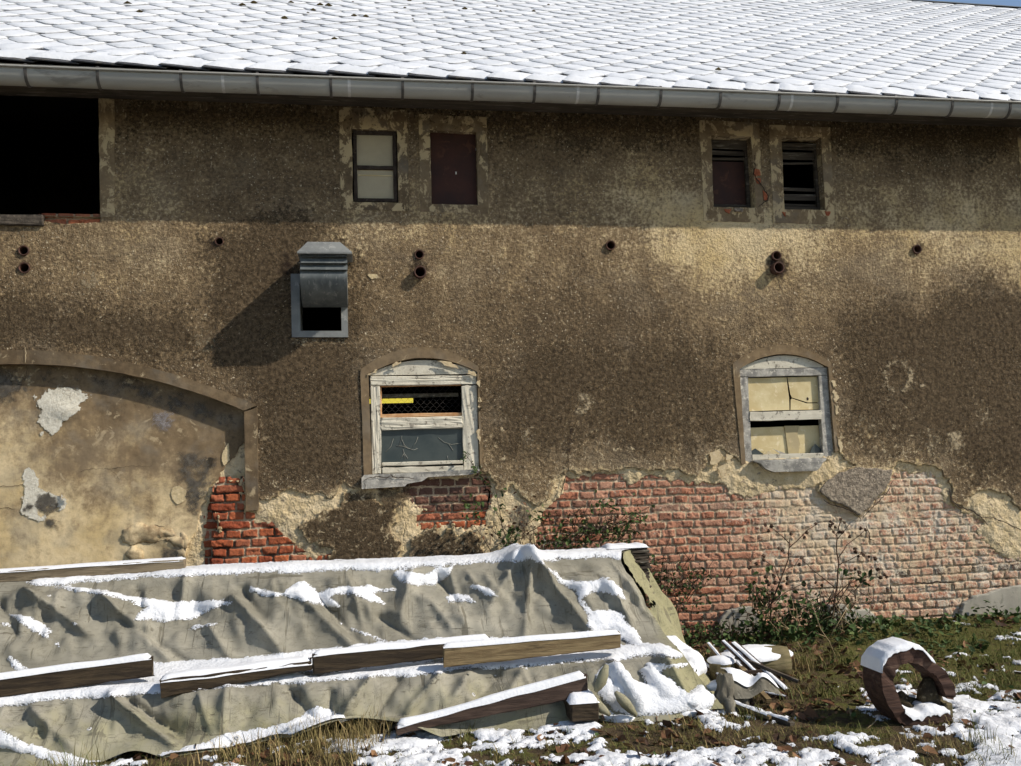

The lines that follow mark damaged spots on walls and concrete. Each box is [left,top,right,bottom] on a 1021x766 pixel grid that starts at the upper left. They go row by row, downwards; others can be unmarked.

peeling [33,387,88,436]
leakage [0,198,483,560]
leakage [480,336,737,473]
leakage [834,269,1021,494]
peeling [20,467,67,527]
flaking render [121,443,359,566]
flaking render [372,436,1021,637]
crack [949,489,1021,530]